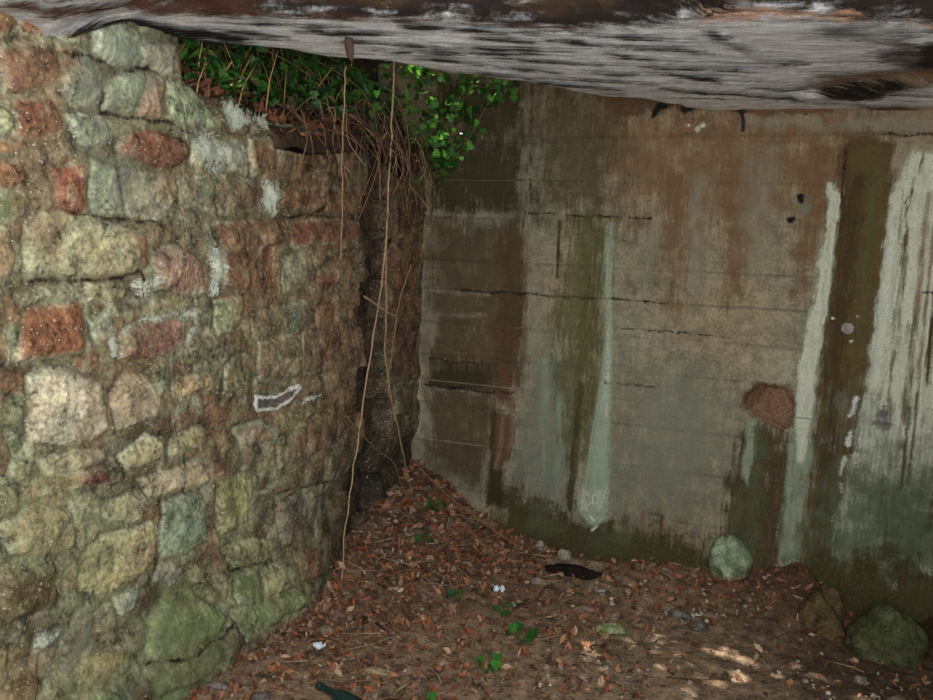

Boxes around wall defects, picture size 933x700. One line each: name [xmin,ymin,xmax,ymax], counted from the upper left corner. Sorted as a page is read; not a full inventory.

damp [682,17,933,68]
damp [2,0,840,570]
damp [776,114,933,590]